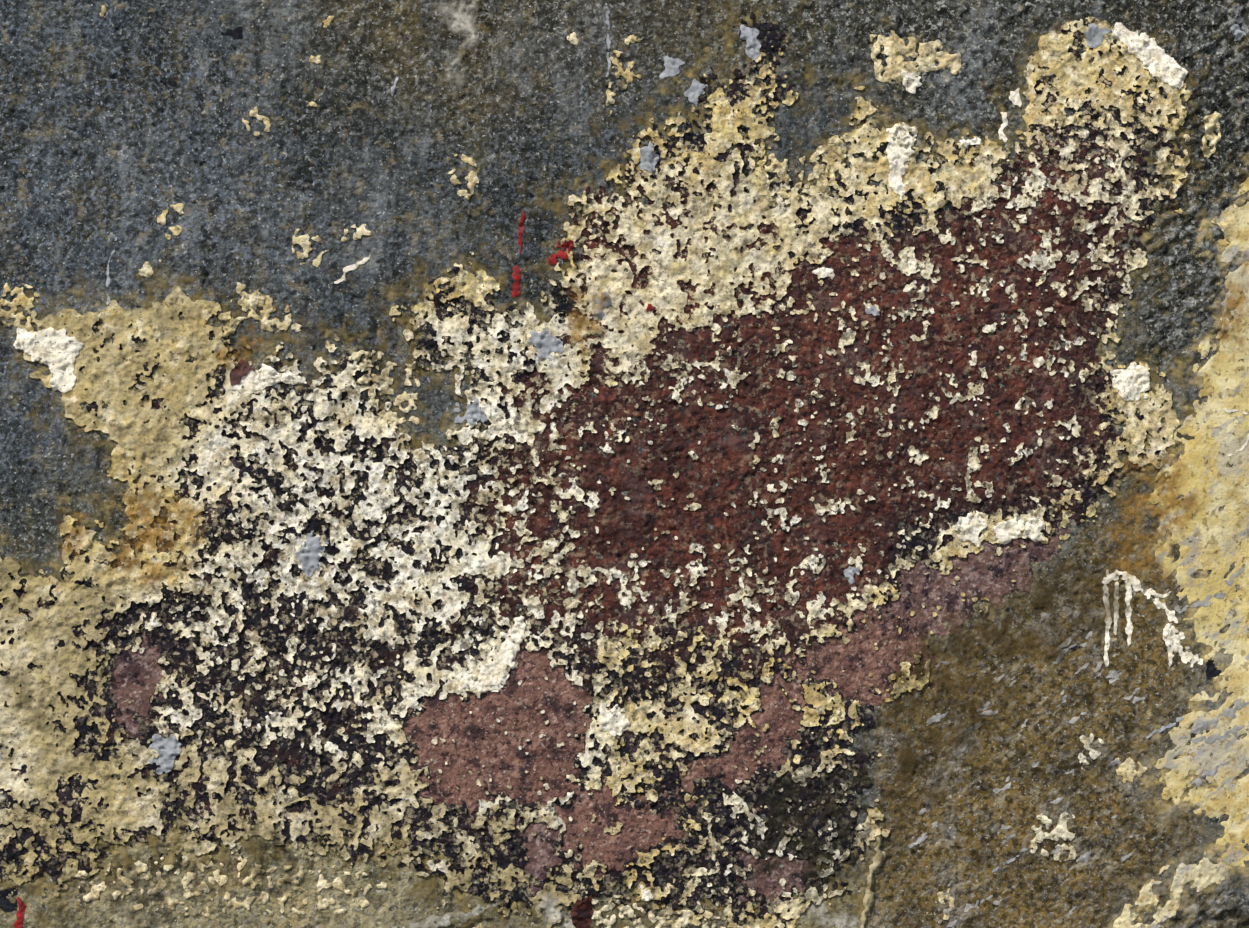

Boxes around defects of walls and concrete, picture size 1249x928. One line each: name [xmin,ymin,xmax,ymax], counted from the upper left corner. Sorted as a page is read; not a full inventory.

peeling [901,70,922,94]
peeling [1009,88,1022,107]
peeling [998,112,1008,142]
peeling [605,164,625,188]
peeling [1113,202,1249,928]
peeling [890,659,937,699]
peeling [599,703,630,736]
flaking render [678,673,811,794]
flaking render [555,781,687,872]
flaking render [520,822,563,881]
peeling [639,884,653,902]
flaking render [736,850,814,902]